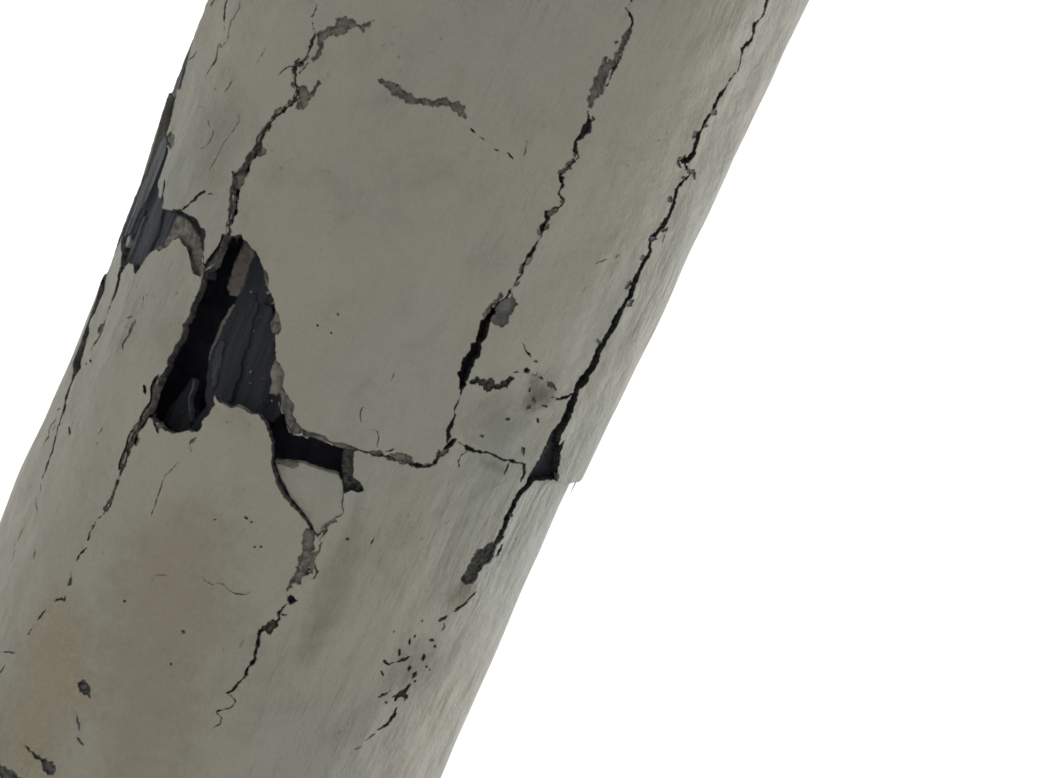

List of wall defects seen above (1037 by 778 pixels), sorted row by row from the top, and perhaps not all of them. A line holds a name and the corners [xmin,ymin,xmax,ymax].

crack [182,0,372,244]
flaking render [378,78,527,159]
spalling [102,40,364,537]
crack [357,0,769,536]
flaking render [0,765,21,778]
crack [0,407,157,673]
crack [12,267,155,561]
flaking render [77,679,91,699]
crack [151,437,197,515]
crack [151,574,251,595]
crack [213,463,338,728]